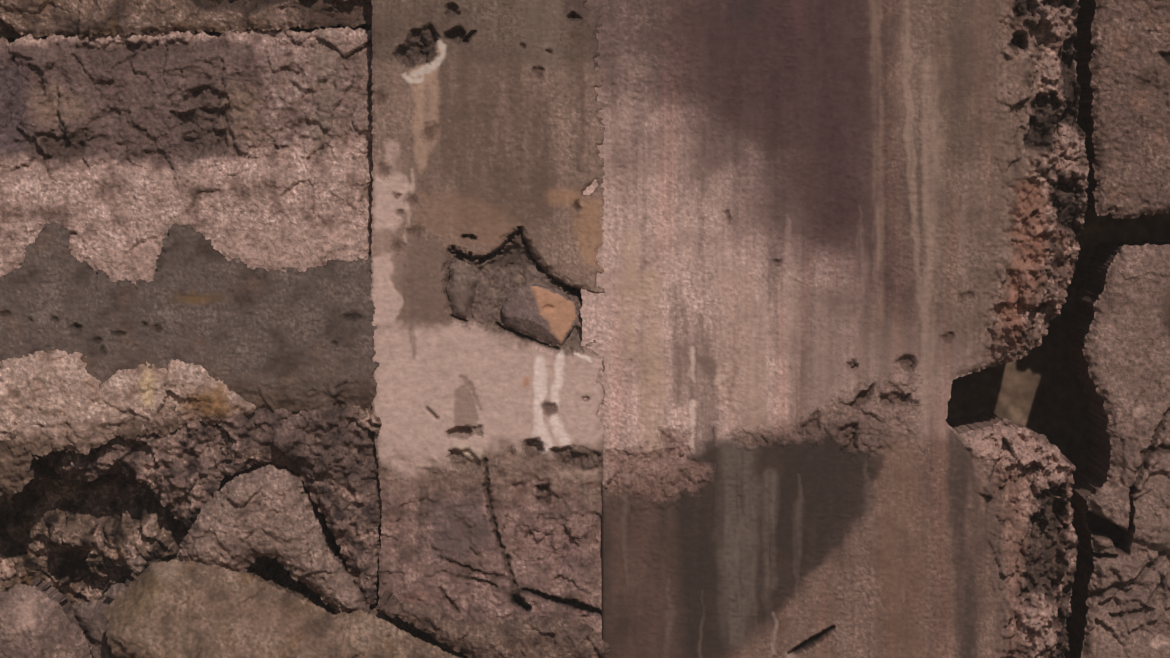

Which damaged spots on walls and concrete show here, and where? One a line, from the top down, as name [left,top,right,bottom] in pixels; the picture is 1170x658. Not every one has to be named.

spalling [1007,0,1088,247]
crack [437,457,602,617]
flaking render [337,160,720,504]
spalling [511,479,601,569]
damp [529,0,1024,658]
spalling [723,354,925,460]
crack [1084,407,1170,560]